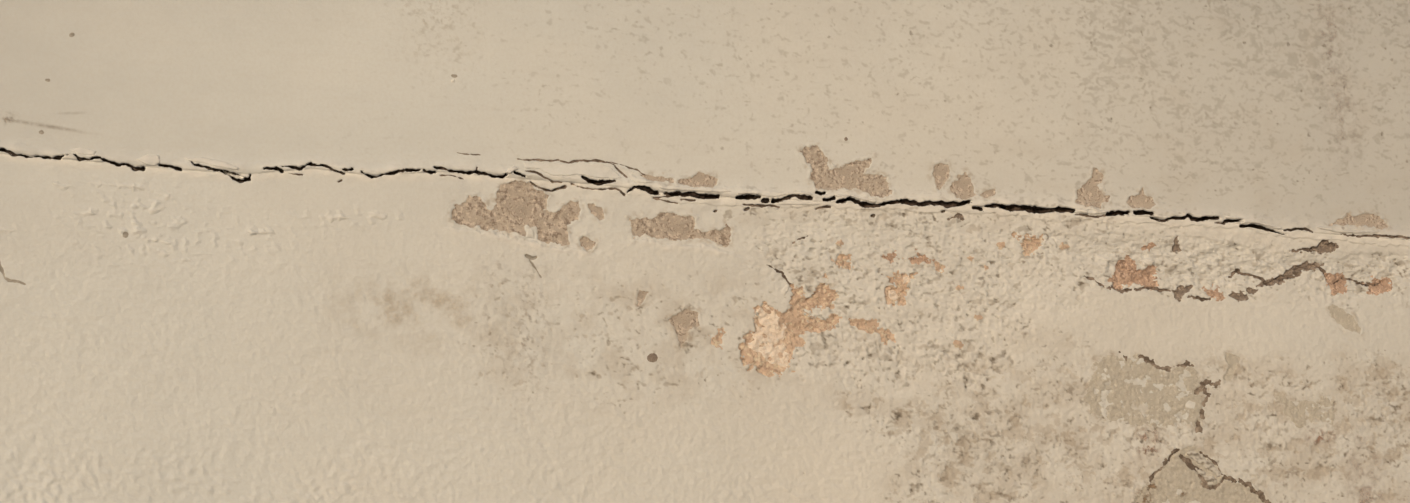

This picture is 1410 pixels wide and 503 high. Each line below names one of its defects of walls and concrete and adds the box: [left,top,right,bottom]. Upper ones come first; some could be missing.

peeling [451,158,731,251]
crack [0,147,1410,302]
peeling [799,145,892,198]
peeling [932,163,996,221]
peeling [1075,168,1110,209]
peeling [1127,187,1156,209]
flaking render [668,239,896,377]
flaking render [881,249,946,306]
flaking render [1108,213,1393,334]
peeling [1083,351,1271,503]